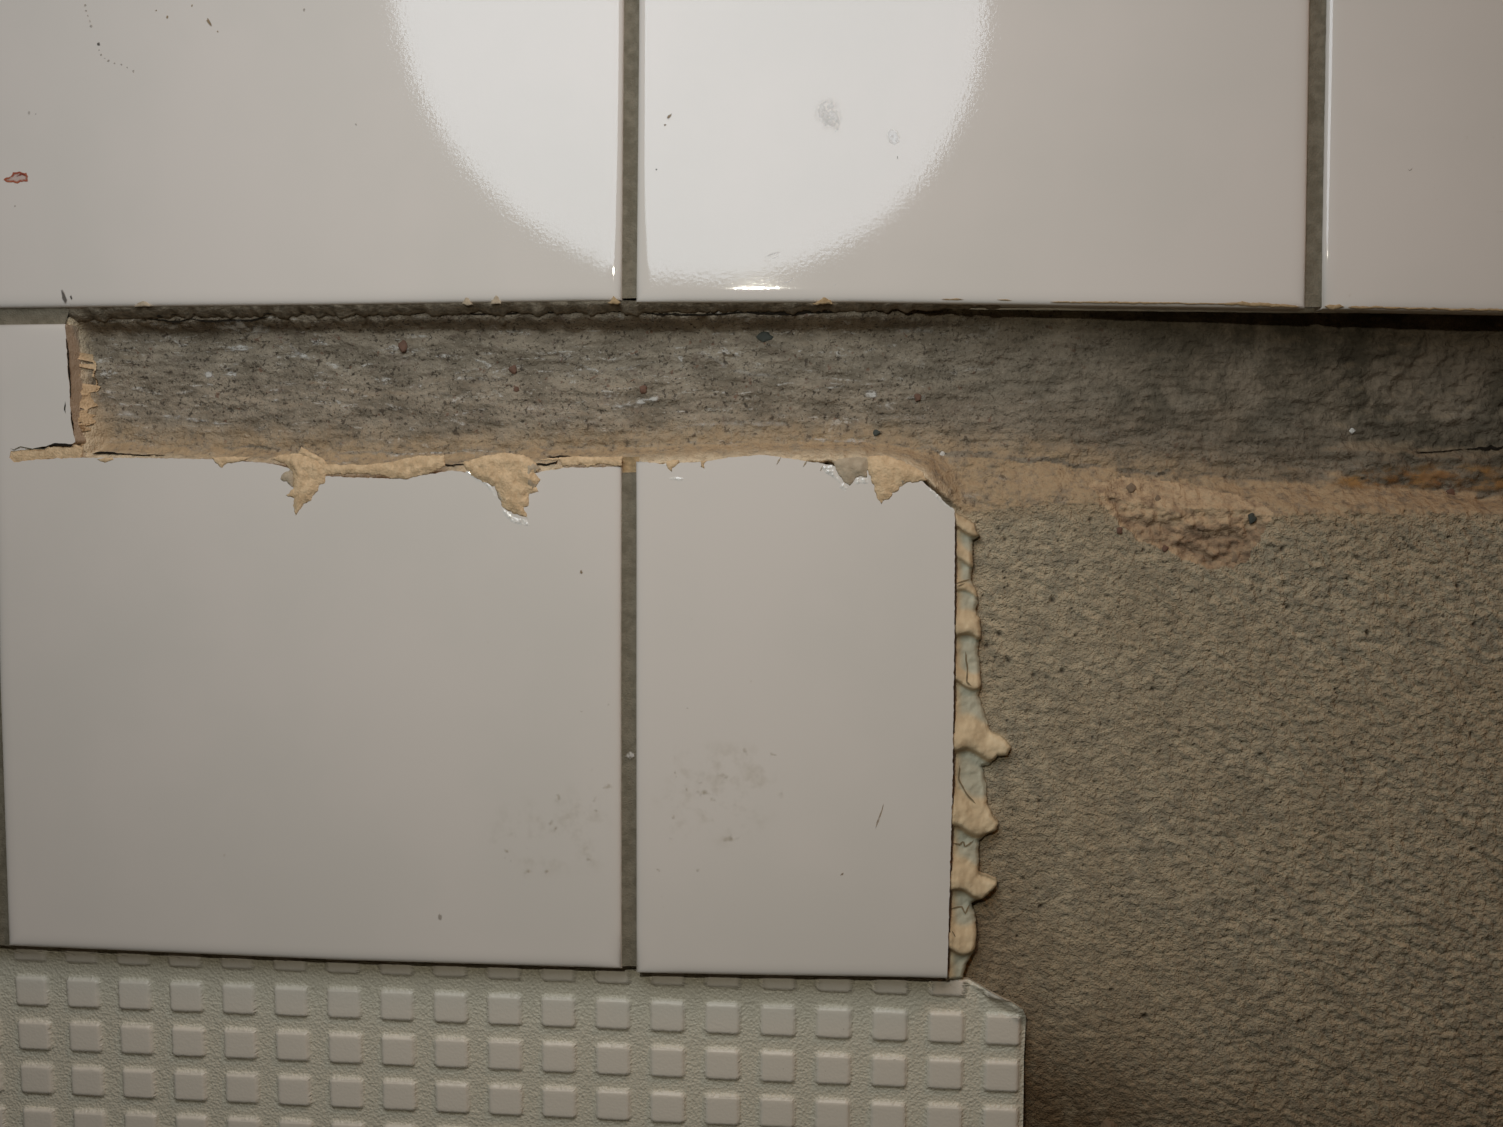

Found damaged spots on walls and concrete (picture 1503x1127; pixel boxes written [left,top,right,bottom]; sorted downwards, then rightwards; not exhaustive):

peeling [78,353,101,446]
peeling [465,471,529,526]
peeling [821,465,868,492]
spalling [1089,476,1274,569]